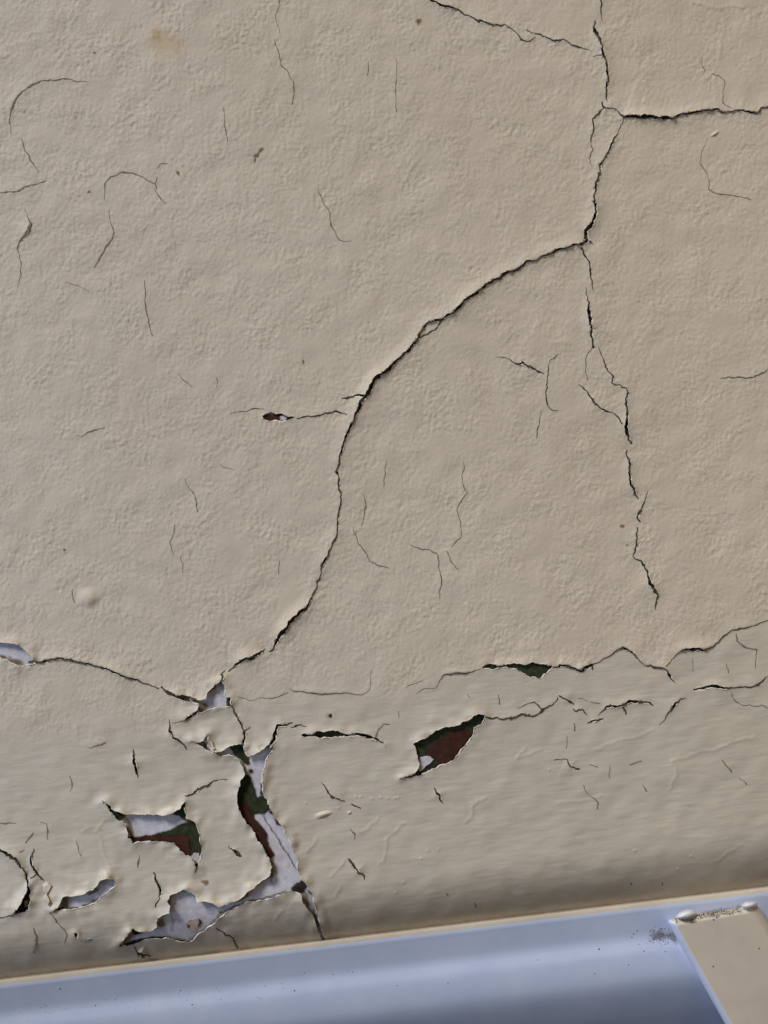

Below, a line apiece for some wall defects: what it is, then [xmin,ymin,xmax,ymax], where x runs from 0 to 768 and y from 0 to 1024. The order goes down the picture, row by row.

crack [0,78,87,288]
crack [65,163,167,288]
crack [220,0,768,749]
peeling [262,412,295,422]
peeling [0,642,37,667]
peeling [185,680,231,721]
peeling [482,662,553,679]
peeling [401,714,485,779]
peeling [102,801,202,874]
peeling [119,735,325,947]
peeling [14,879,115,913]